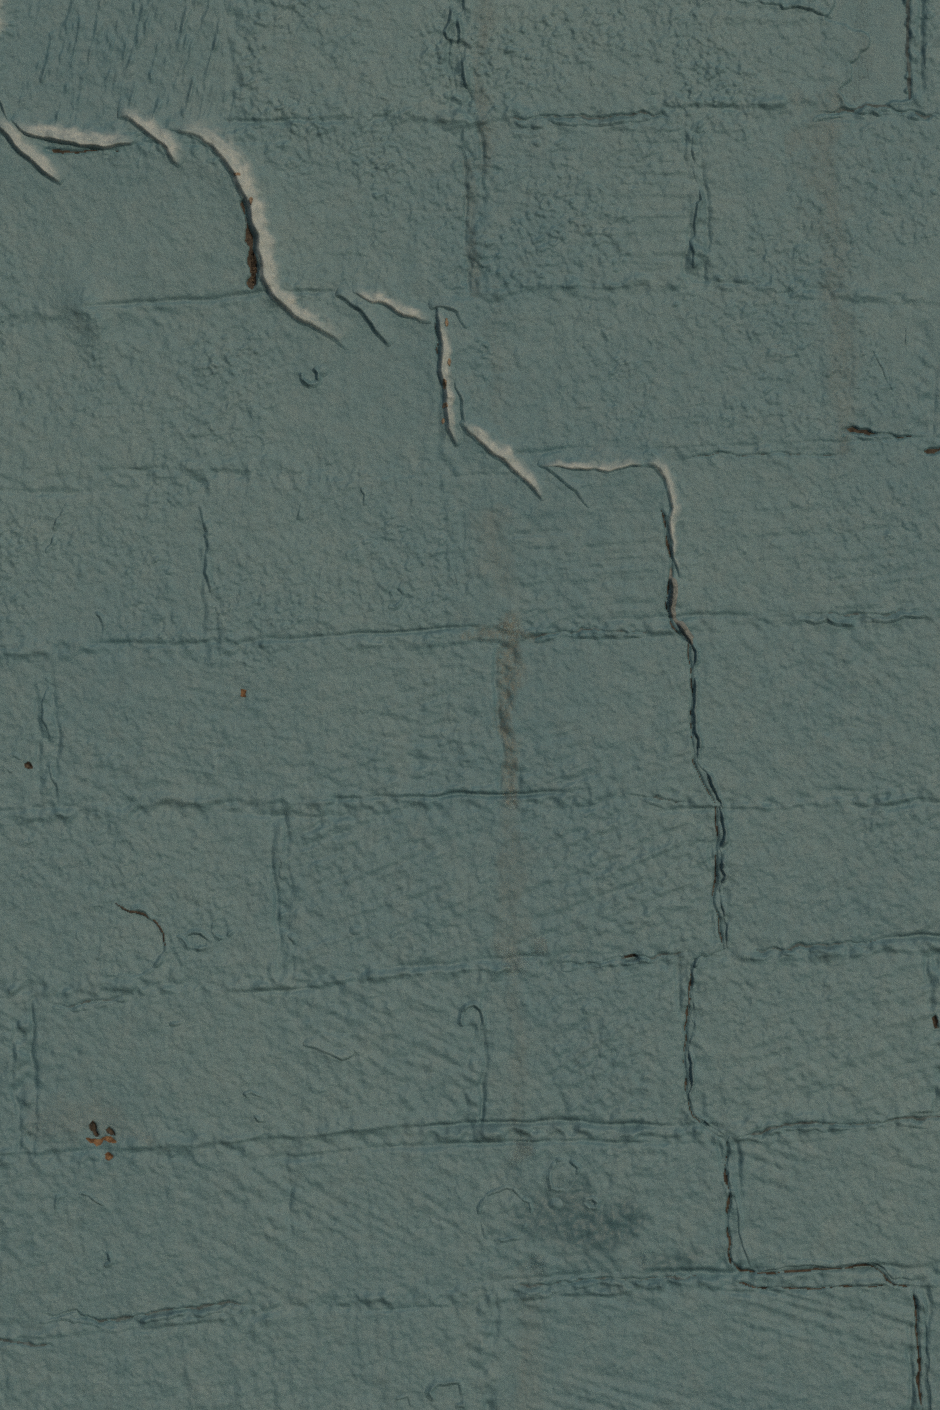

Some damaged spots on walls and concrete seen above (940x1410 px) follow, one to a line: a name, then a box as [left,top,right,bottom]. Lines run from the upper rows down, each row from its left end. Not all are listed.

crack [0,0,356,350]
crack [513,111,677,130]
crack [335,277,940,1288]
crack [782,1283,852,1291]
crack [913,1289,937,1410]